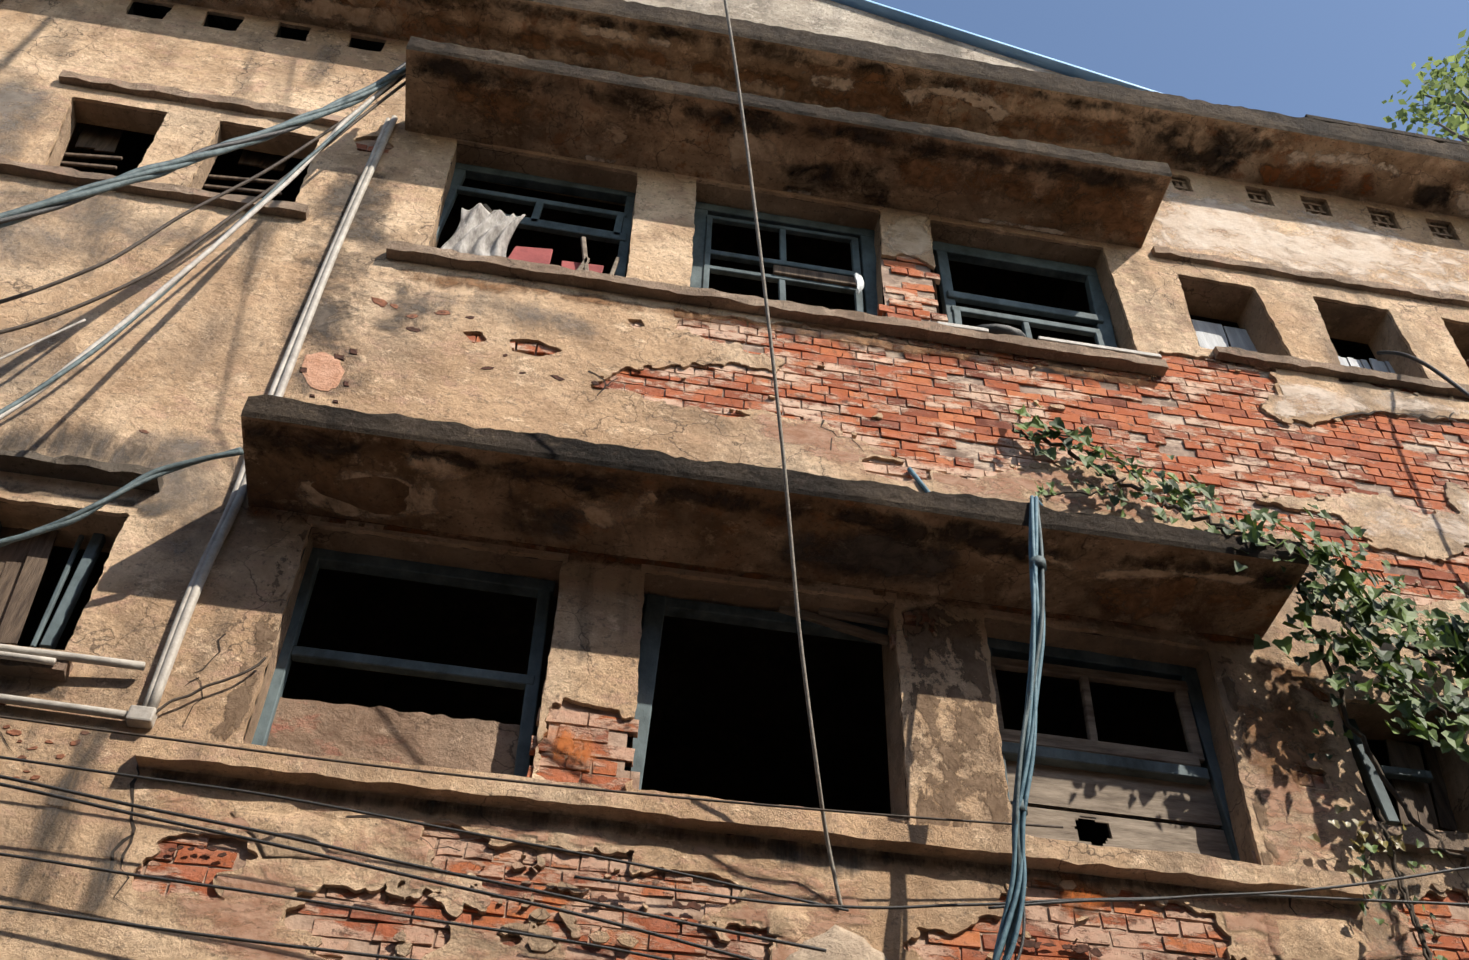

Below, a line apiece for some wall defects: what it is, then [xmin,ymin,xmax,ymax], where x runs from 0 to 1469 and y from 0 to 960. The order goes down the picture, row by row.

water stain [415,14,1155,236]
water stain [290,256,364,349]
water stain [316,172,391,243]
water stain [886,215,932,256]
spalling [877,248,948,323]
peeling [1154,194,1469,292]
water stain [244,423,810,541]
spalling [591,311,1469,606]
spalling [527,680,640,791]
crack [113,763,140,905]
spalling [132,796,870,960]
spalling [902,879,1338,960]